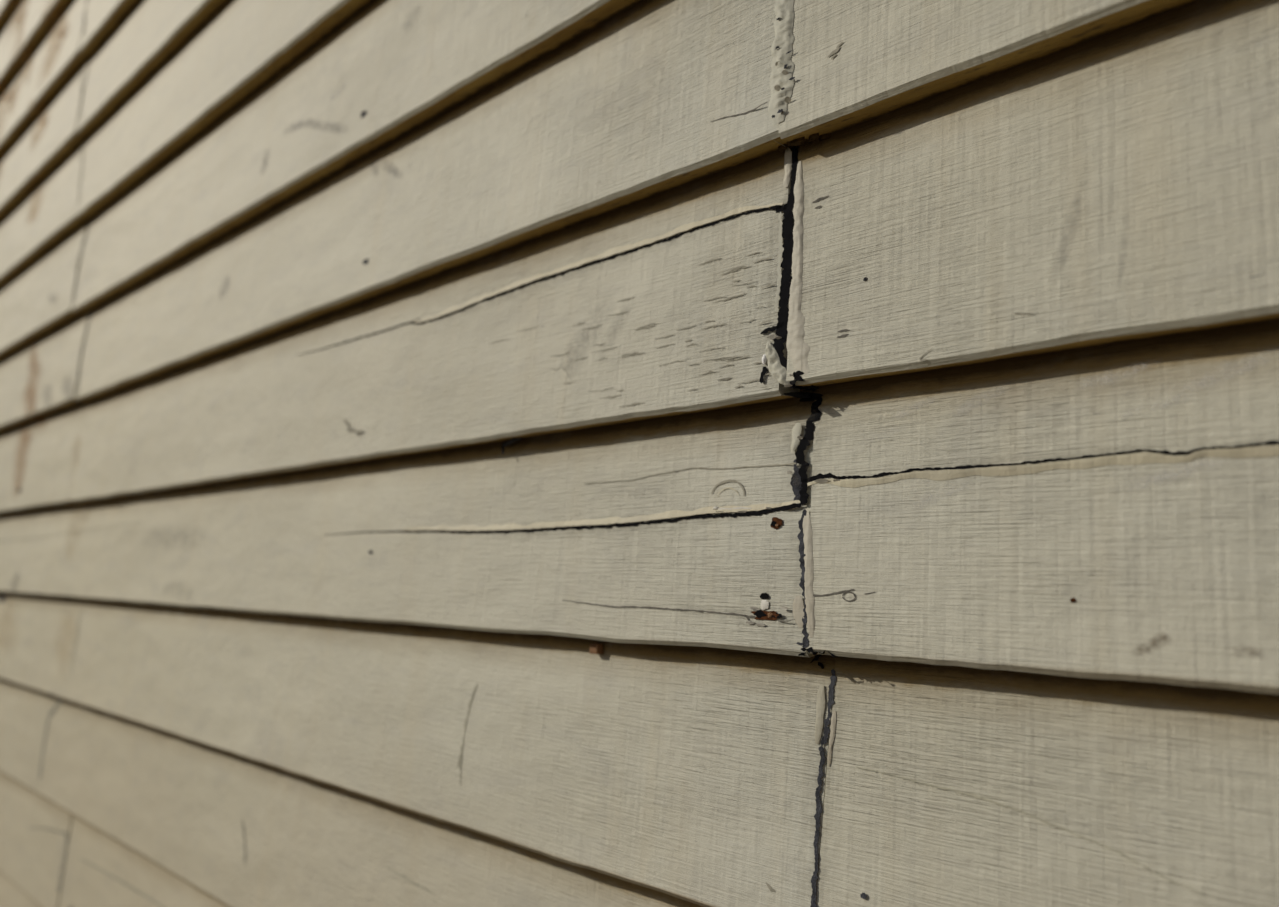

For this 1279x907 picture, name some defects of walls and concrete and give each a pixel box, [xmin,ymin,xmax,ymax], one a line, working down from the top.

crack [711,102,767,122]
crack [299,141,1279,648]
crack [810,669,836,907]